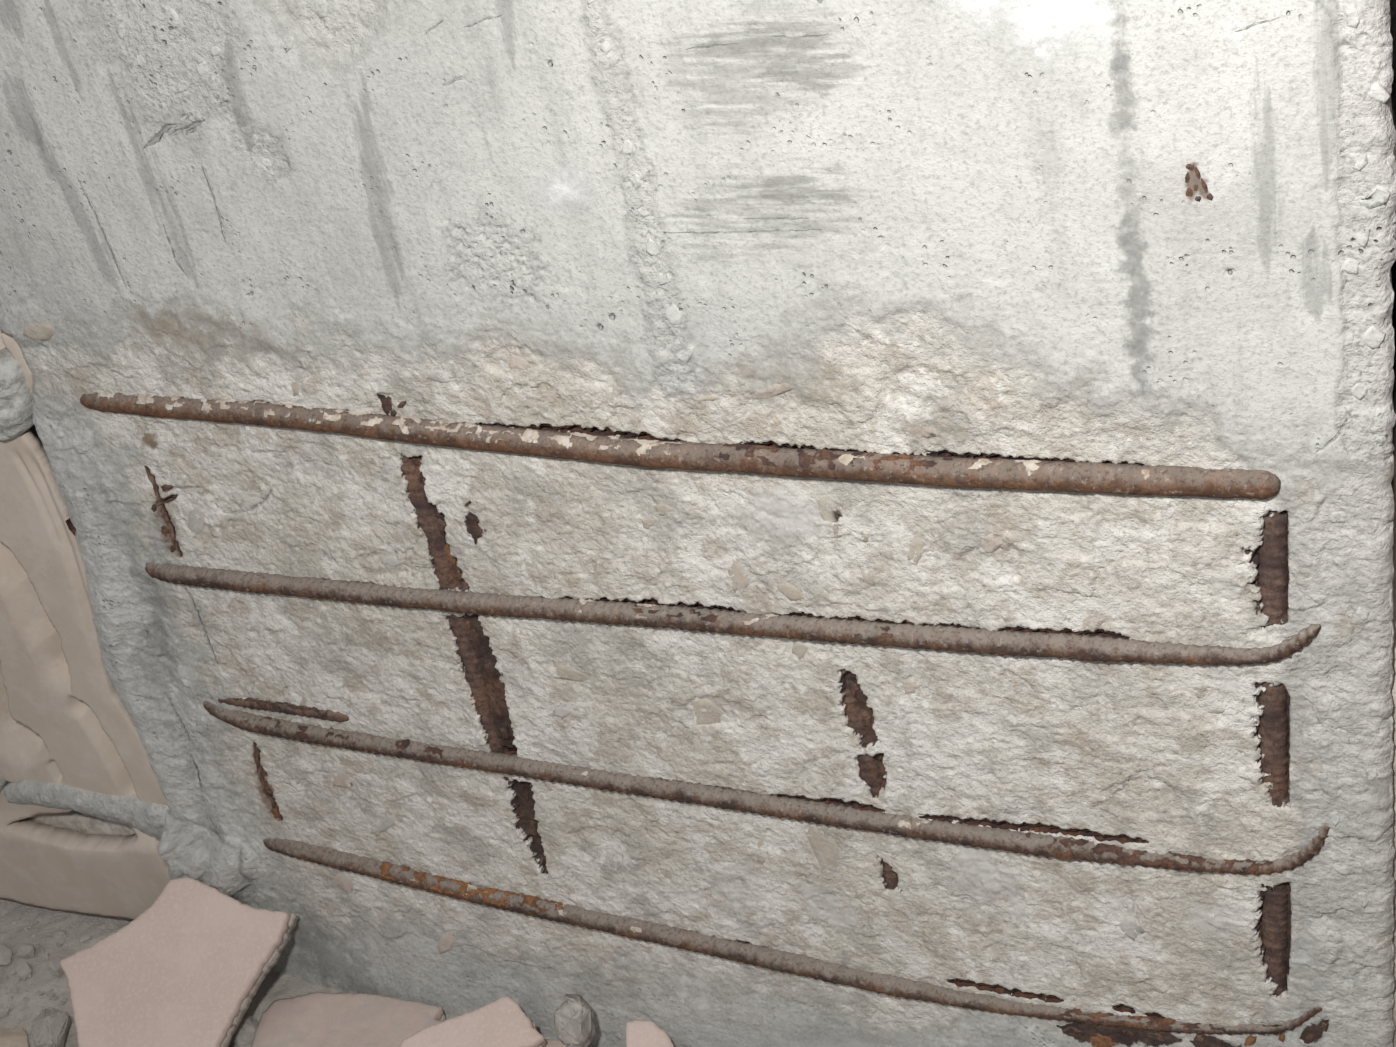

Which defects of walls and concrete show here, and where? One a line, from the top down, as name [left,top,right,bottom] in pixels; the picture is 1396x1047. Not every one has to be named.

spalling [81,0,241,134]
peeling [262,0,403,68]
damp [946,0,1116,60]
corrosion [1185,162,1213,201]
corrosion [464,500,486,544]
spalling [21,299,1330,876]
spalling [478,0,1396,1047]
corrosion [446,614,517,749]
corrosion [838,669,887,798]
corrosion [503,777,548,874]
spalling [205,721,1322,1047]
corrosion [1056,1018,1329,1047]